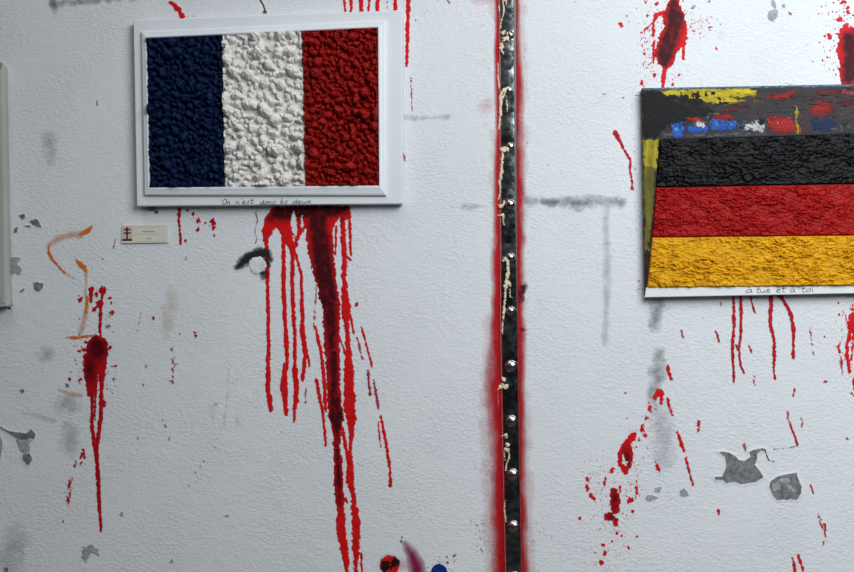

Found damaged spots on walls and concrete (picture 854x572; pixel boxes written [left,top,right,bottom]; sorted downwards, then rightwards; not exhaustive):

peeling [0,424,37,467]
spalling [712,445,805,503]